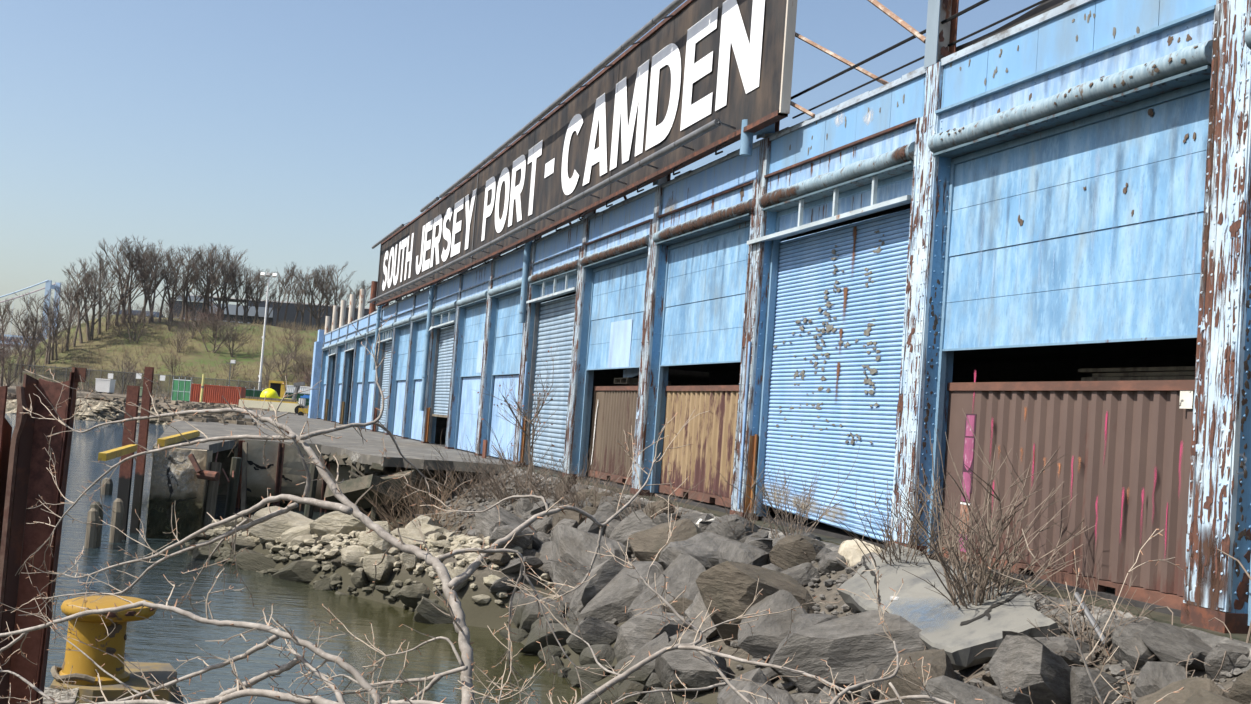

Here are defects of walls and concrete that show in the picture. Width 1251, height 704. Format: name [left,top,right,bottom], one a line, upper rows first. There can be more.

corrosion [939,30,952,57]
peeling [1145,34,1198,73]
peeling [737,171,764,410]
peeling [774,245,881,444]
peeling [892,116,964,534]
peeling [1186,14,1251,579]
peeling [731,426,746,501]